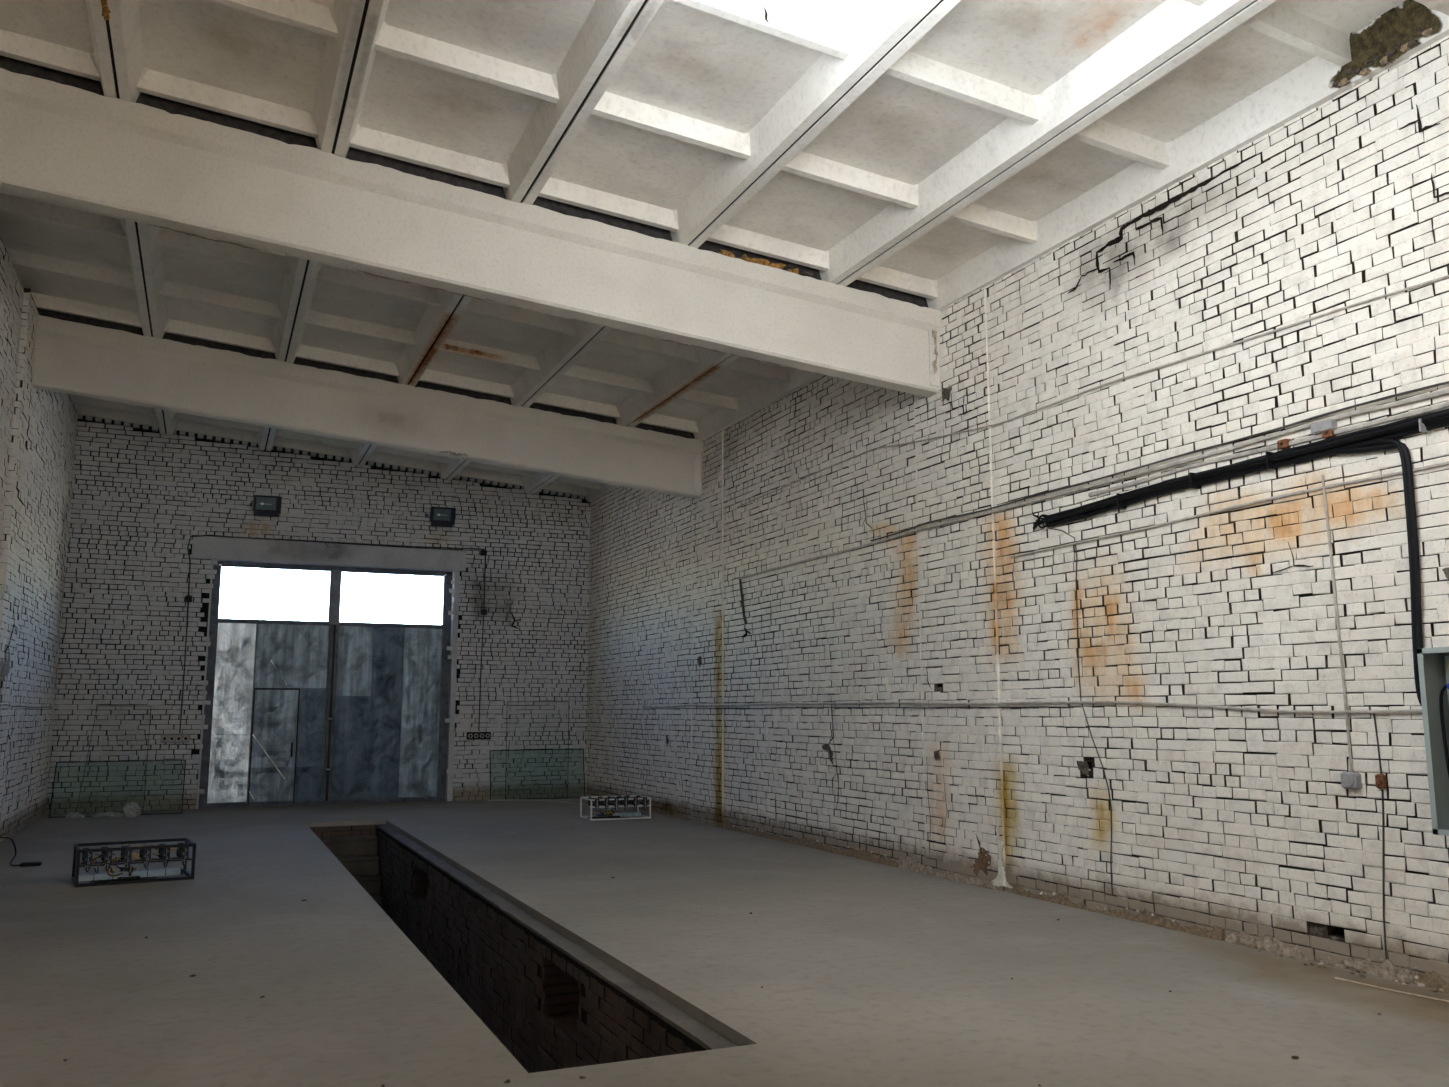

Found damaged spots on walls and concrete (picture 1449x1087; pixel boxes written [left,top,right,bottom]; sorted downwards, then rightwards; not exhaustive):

spalling [1328,0,1441,88]
crack [1068,161,1242,293]